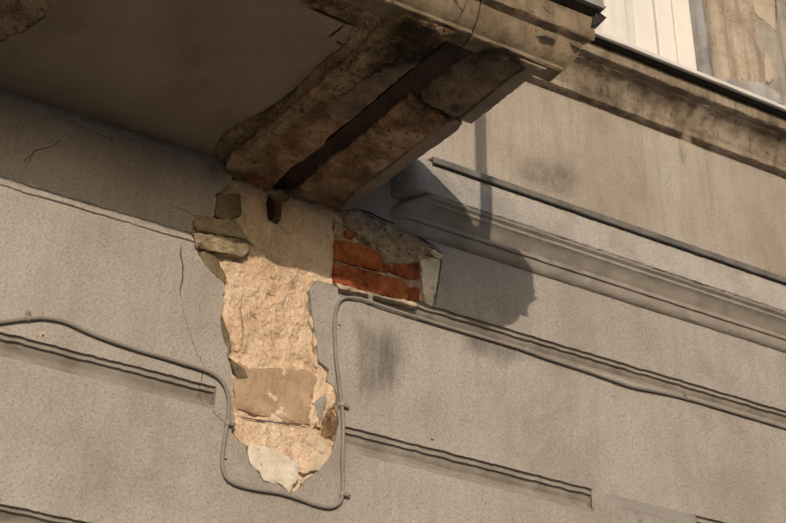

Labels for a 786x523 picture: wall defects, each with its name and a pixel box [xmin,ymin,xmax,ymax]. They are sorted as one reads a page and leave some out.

flaking render [753,0,776,30]
peeling [326,50,419,121]
flaking render [763,53,774,84]
crack [179,246,224,422]
flaking render [190,180,444,492]